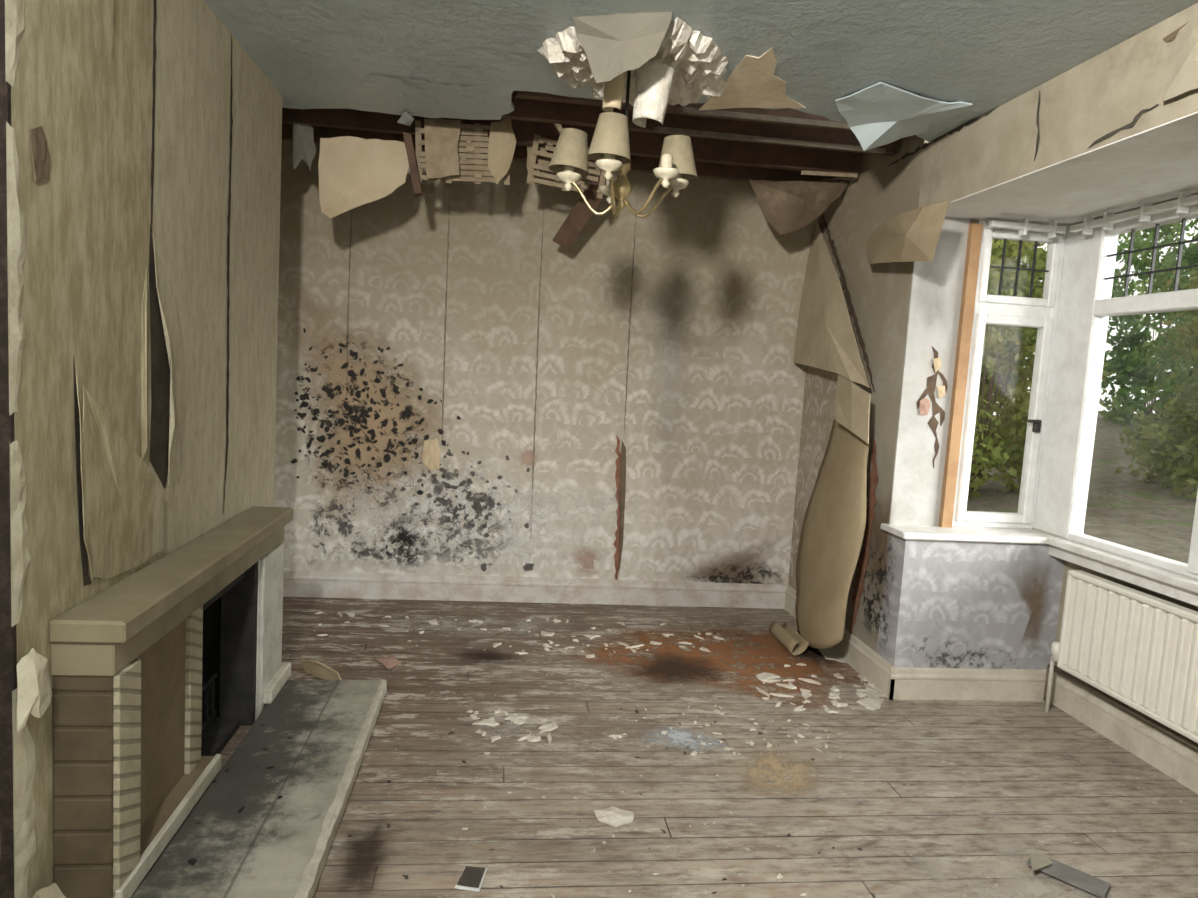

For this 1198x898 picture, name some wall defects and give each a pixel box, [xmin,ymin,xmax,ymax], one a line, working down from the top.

peeling [699,47,806,110]
damp [291,334,560,571]
damp [1024,584,1043,633]
damp [920,640,995,668]